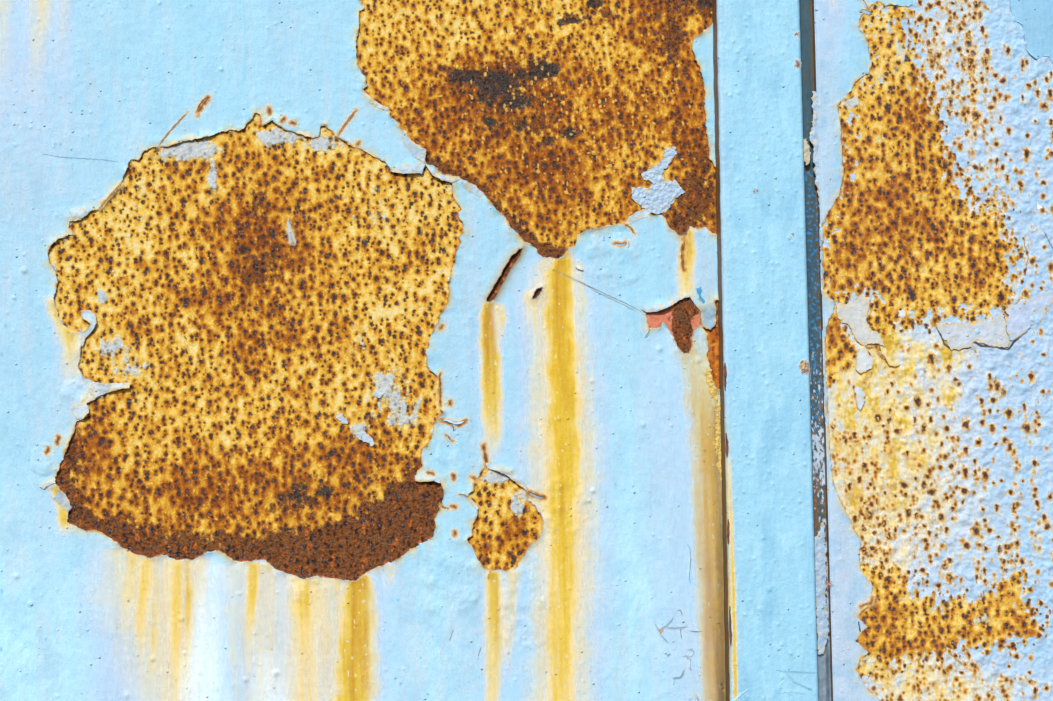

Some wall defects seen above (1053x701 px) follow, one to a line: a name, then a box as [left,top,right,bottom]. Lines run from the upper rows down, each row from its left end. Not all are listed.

peeling [838,100,863,199]
corrosion [39,0,739,701]
peeling [822,330,834,425]
peeling [819,215,903,374]
peeling [851,384,876,417]
peeling [859,0,1053,701]